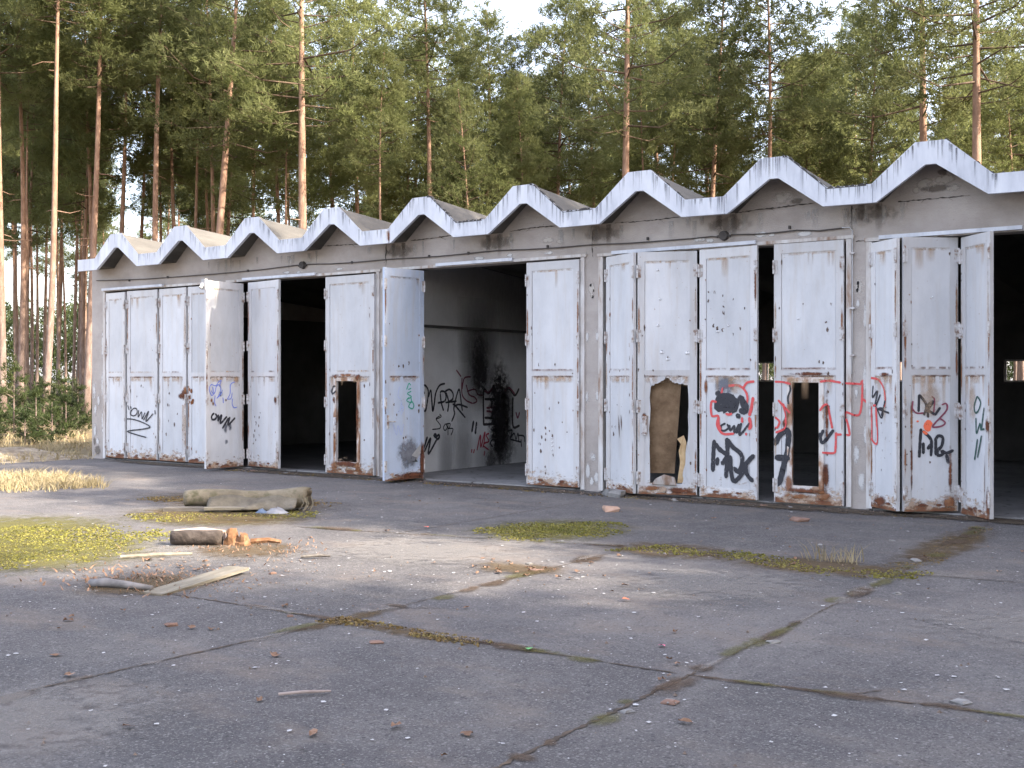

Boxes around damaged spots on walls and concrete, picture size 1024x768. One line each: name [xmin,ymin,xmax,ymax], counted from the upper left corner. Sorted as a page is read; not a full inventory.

corrosion [106,372,278,469]
corrosion [326,370,365,429]
water stain [468,332,510,460]
corrosion [775,366,832,380]
corrosion [916,337,989,406]
corrosion [327,437,373,476]
corrosion [528,471,578,488]
corrosion [775,465,842,506]
corrosion [871,403,990,520]
crack [0,585,483,697]
crack [492,524,1024,768]